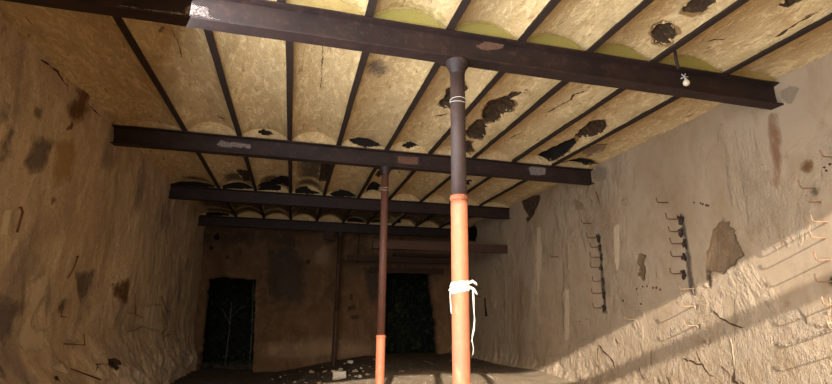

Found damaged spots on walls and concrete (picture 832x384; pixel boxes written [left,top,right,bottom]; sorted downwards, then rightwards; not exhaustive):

spalling [679,0,723,17]
spalling [649,20,681,47]
crack [40,59,68,86]
water stain [66,90,90,130]
spalling [437,88,450,111]
spalling [466,88,527,154]
water stain [26,139,74,182]
spalling [538,119,607,165]
spalling [692,217,745,293]
water stain [0,269,50,353]
water stain [114,280,129,303]